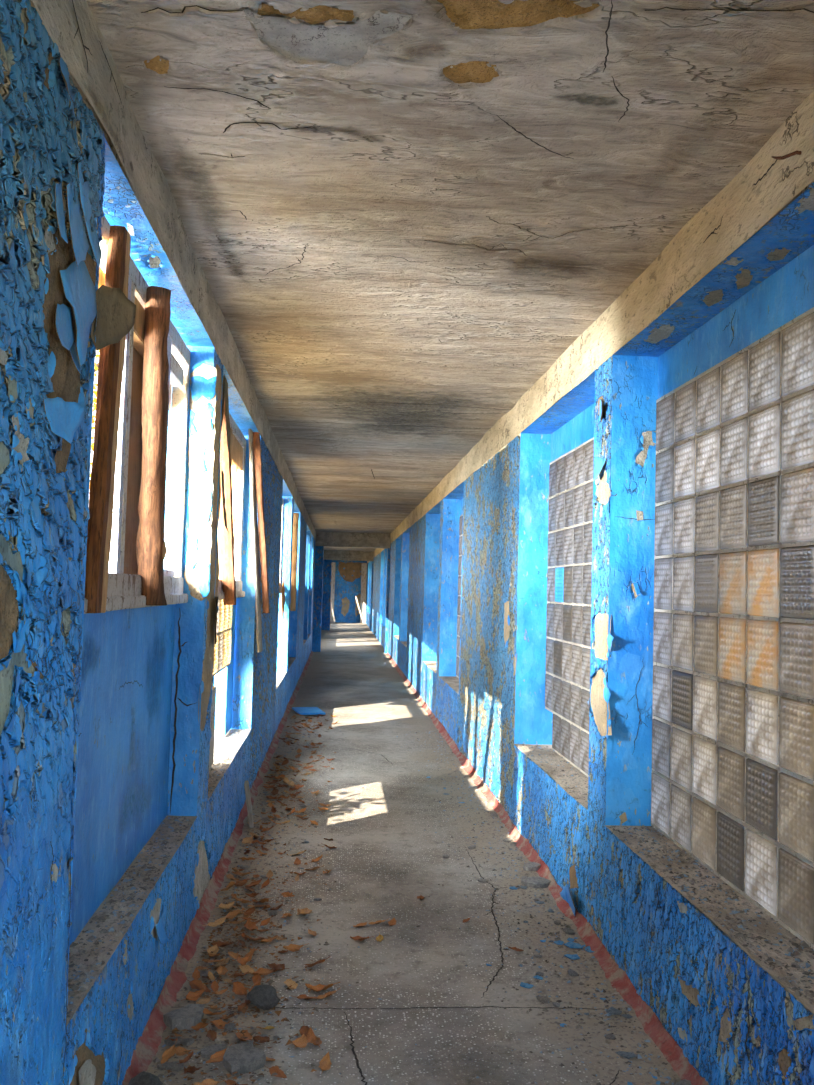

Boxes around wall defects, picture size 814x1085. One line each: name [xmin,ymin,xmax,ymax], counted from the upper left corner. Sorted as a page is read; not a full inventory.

crack [141,5,246,20]
spalling [242,3,414,69]
spalling [425,0,599,31]
crack [603,0,629,120]
crack [643,7,814,23]
crack [164,86,320,161]
crack [498,116,573,159]
peeling [0,160,136,477]
peeling [184,363,231,735]
peeling [0,524,46,736]
crack [275,847,608,1085]
spalling [68,1023,110,1085]